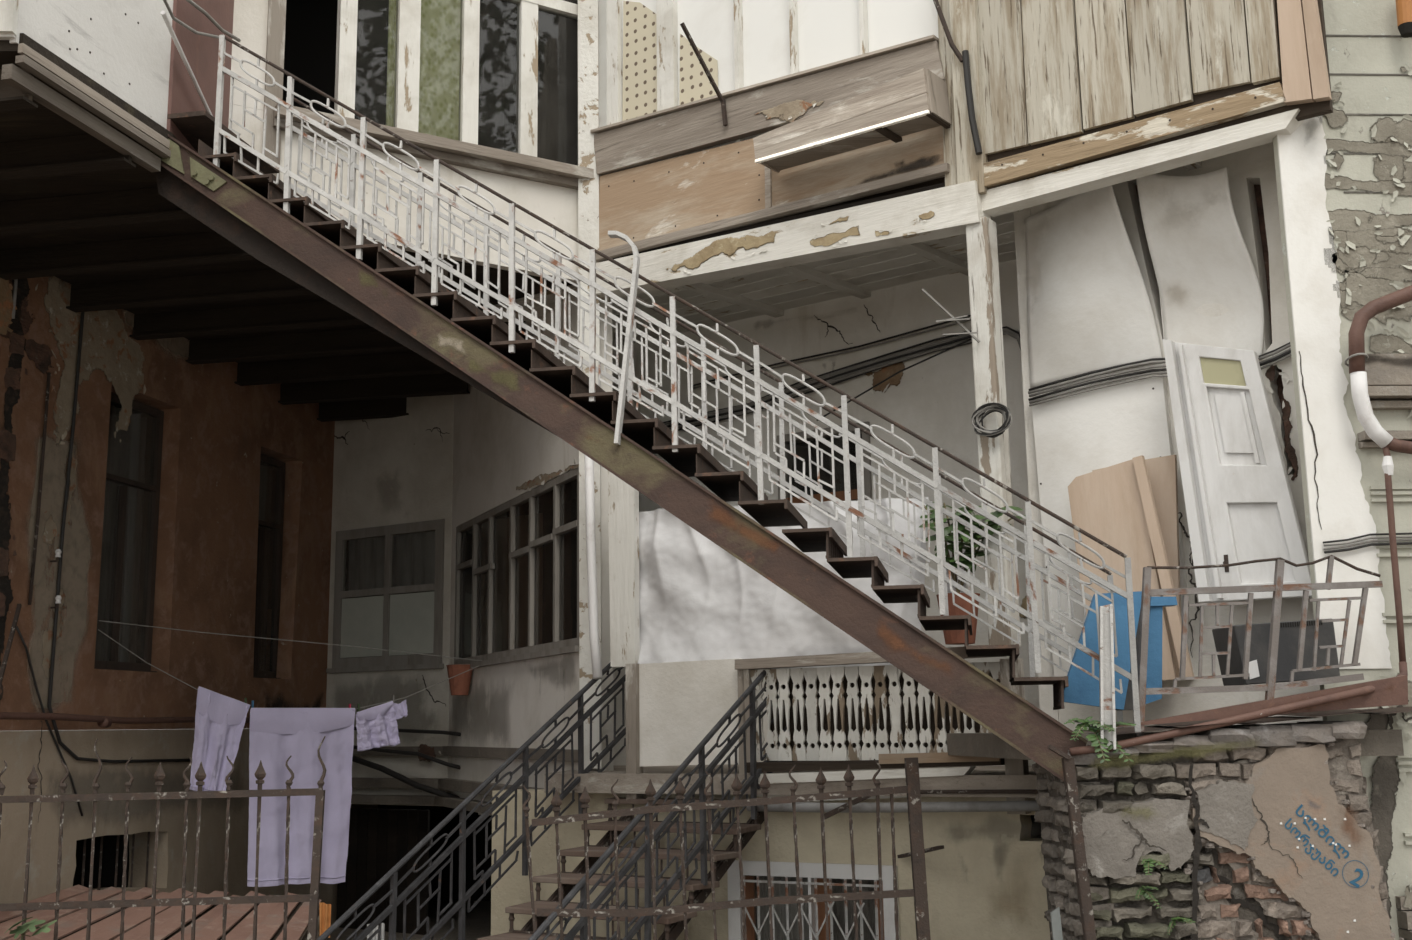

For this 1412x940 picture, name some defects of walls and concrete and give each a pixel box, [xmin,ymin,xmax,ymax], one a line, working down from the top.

peeling [666,231,776,274]
peeling [810,216,891,247]
peeling [1324,81,1412,354]
peeling [0,276,146,709]
flaking render [1378,673,1412,727]
crack [1122,763,1285,940]
crack [1252,798,1303,879]